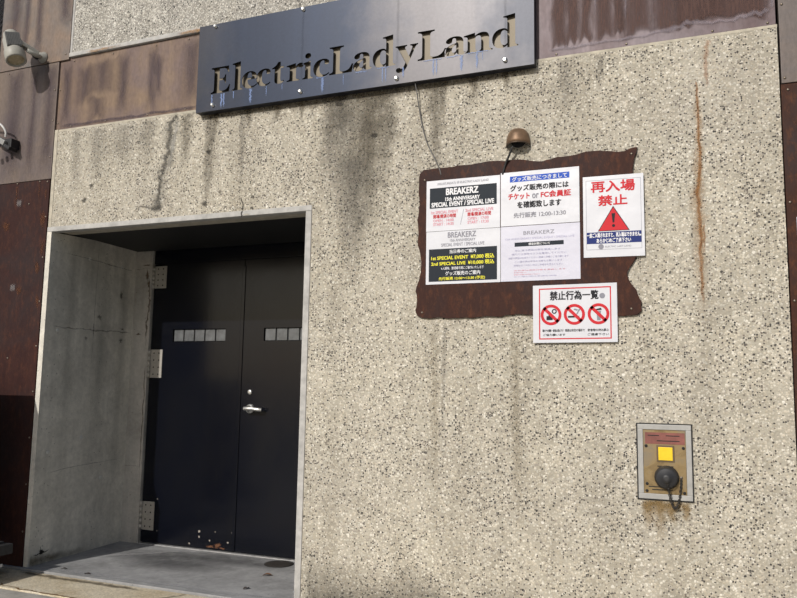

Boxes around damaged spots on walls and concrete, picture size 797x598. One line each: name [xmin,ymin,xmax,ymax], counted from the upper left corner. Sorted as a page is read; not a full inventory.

rust [696,84,705,289]